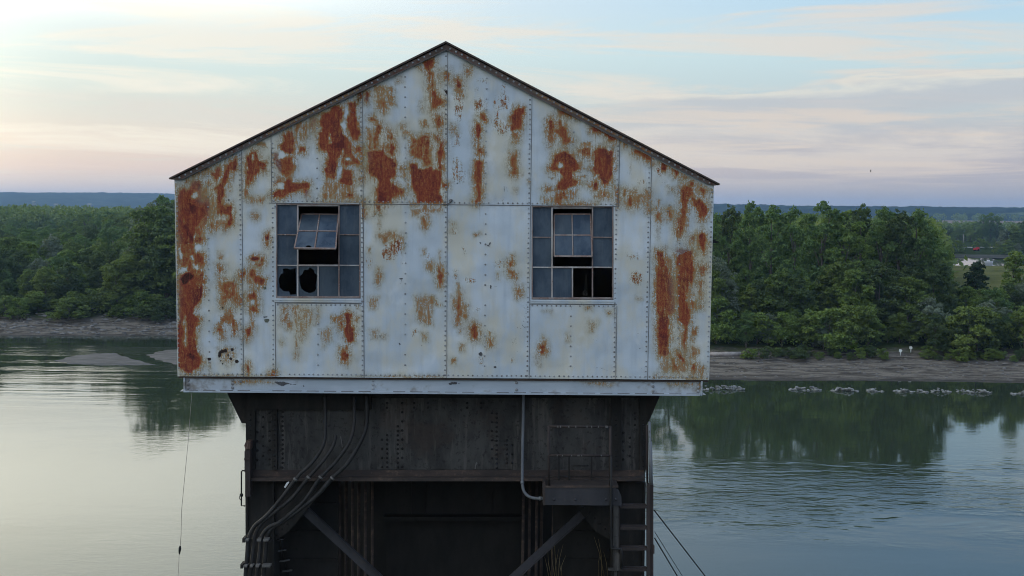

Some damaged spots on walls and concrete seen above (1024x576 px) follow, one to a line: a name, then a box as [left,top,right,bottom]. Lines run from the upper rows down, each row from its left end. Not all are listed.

rust [175,57,527,377]
rust [537,94,713,380]